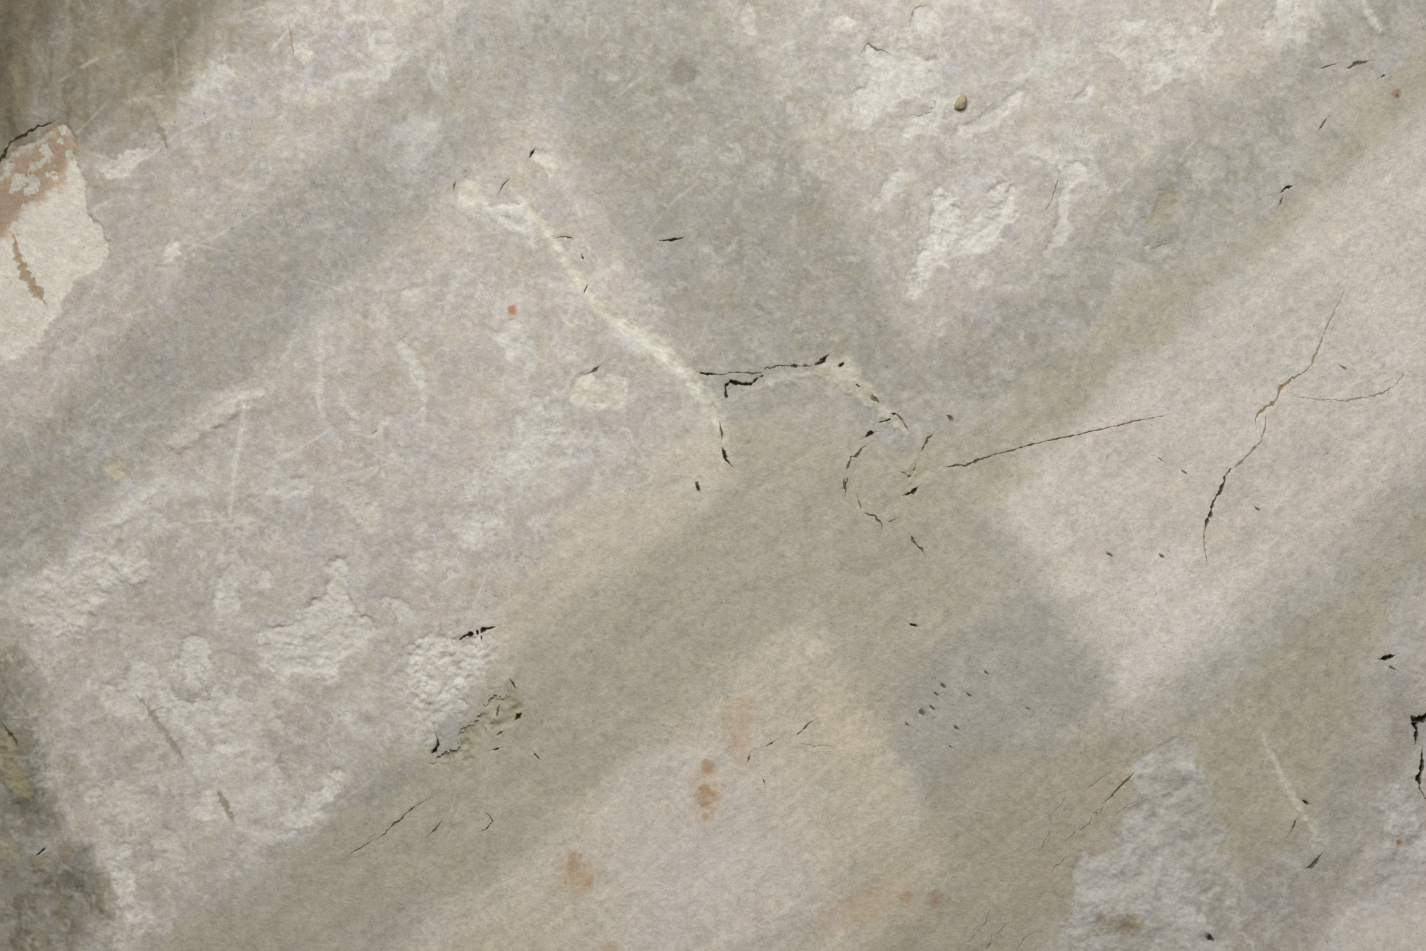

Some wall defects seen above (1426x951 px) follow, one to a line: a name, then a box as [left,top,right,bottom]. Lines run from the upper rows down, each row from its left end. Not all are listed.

flaking render [165,0,351,116]
flaking render [0,105,198,386]
crack [437,133,1171,503]
crack [1196,289,1411,568]
crack [1373,647,1426,808]